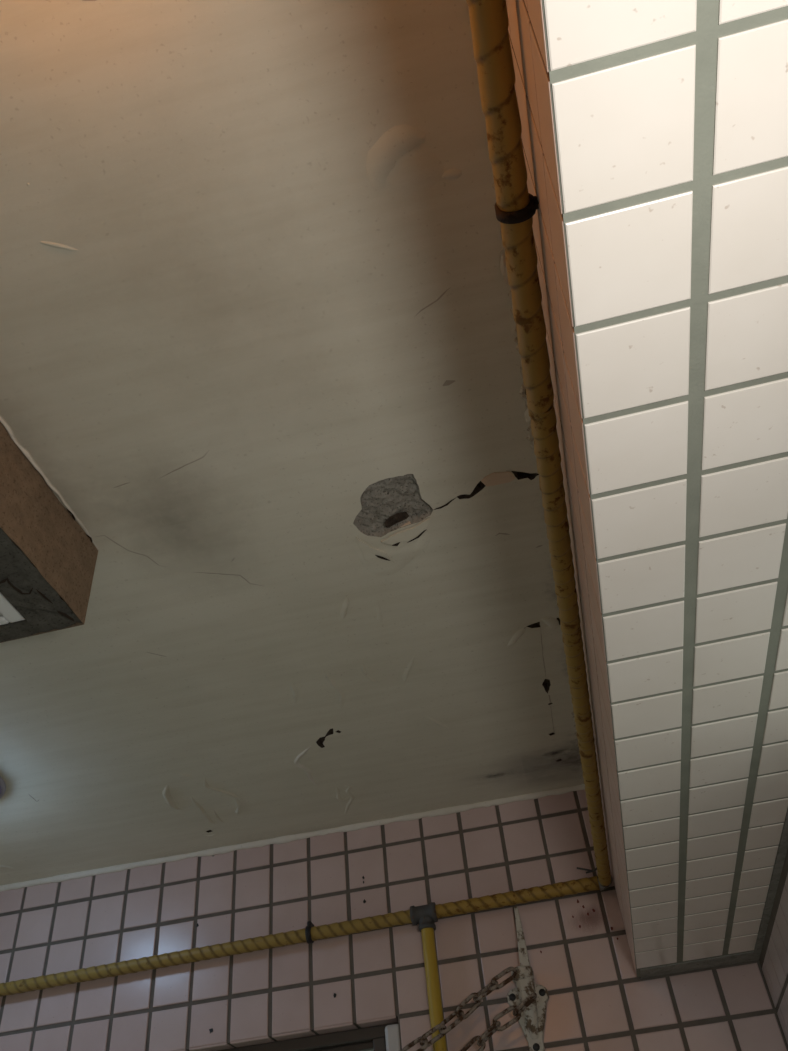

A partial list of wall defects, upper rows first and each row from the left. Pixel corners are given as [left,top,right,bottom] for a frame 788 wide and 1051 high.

crack [434,471,539,510]
flaking render [353,474,433,576]
crack [507,616,560,676]
peeling [294,728,341,785]